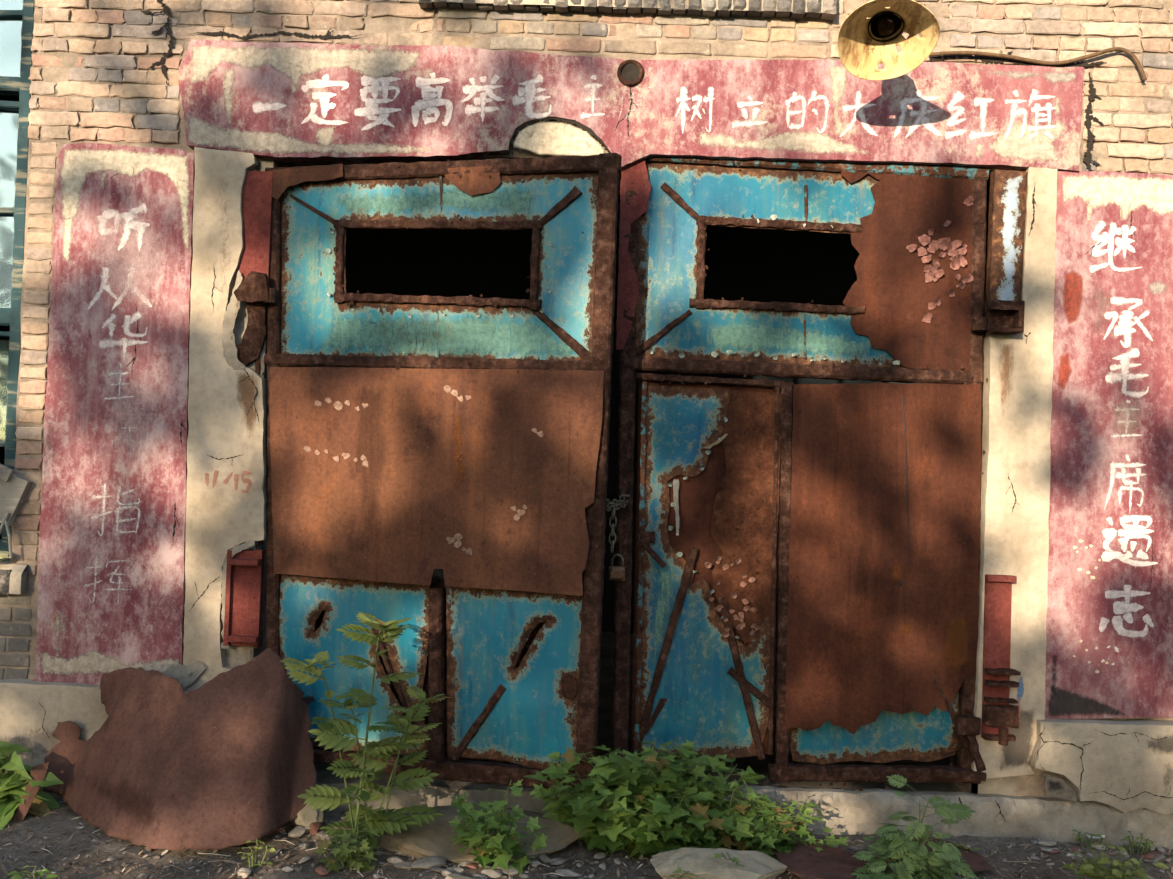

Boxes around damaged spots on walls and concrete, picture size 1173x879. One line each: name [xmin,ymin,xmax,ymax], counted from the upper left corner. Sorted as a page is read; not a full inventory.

spalling [141,0,174,85]
peeling [188,27,437,154]
peeling [930,51,1173,220]
peeling [61,149,189,261]
corrosion [906,220,973,323]
corrosion [315,398,369,411]
corrosion [444,385,471,402]
corrosion [304,446,368,468]
corrosion [446,533,472,555]
corrosion [510,505,527,521]
crack [1037,726,1173,800]